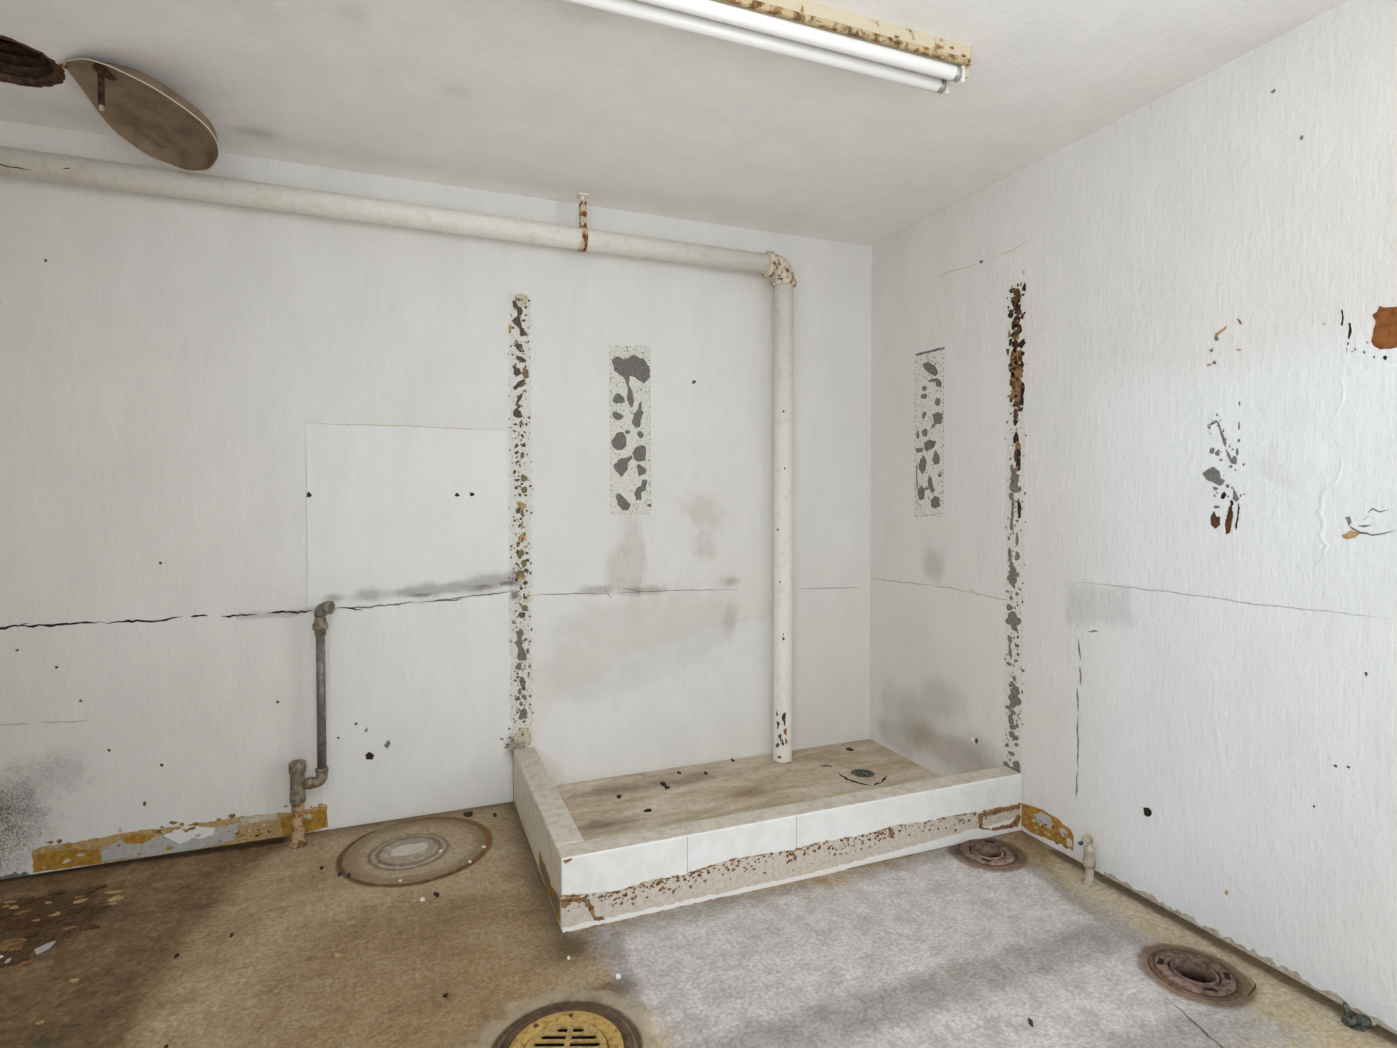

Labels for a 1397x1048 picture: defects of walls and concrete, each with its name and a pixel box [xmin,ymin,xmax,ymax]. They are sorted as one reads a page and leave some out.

peeling [1207,318,1242,366]
peeling [500,293,534,754]
peeling [1202,401,1246,534]
crack [0,587,733,630]
crack [1076,626,1097,799]
peeling [164,825,215,844]